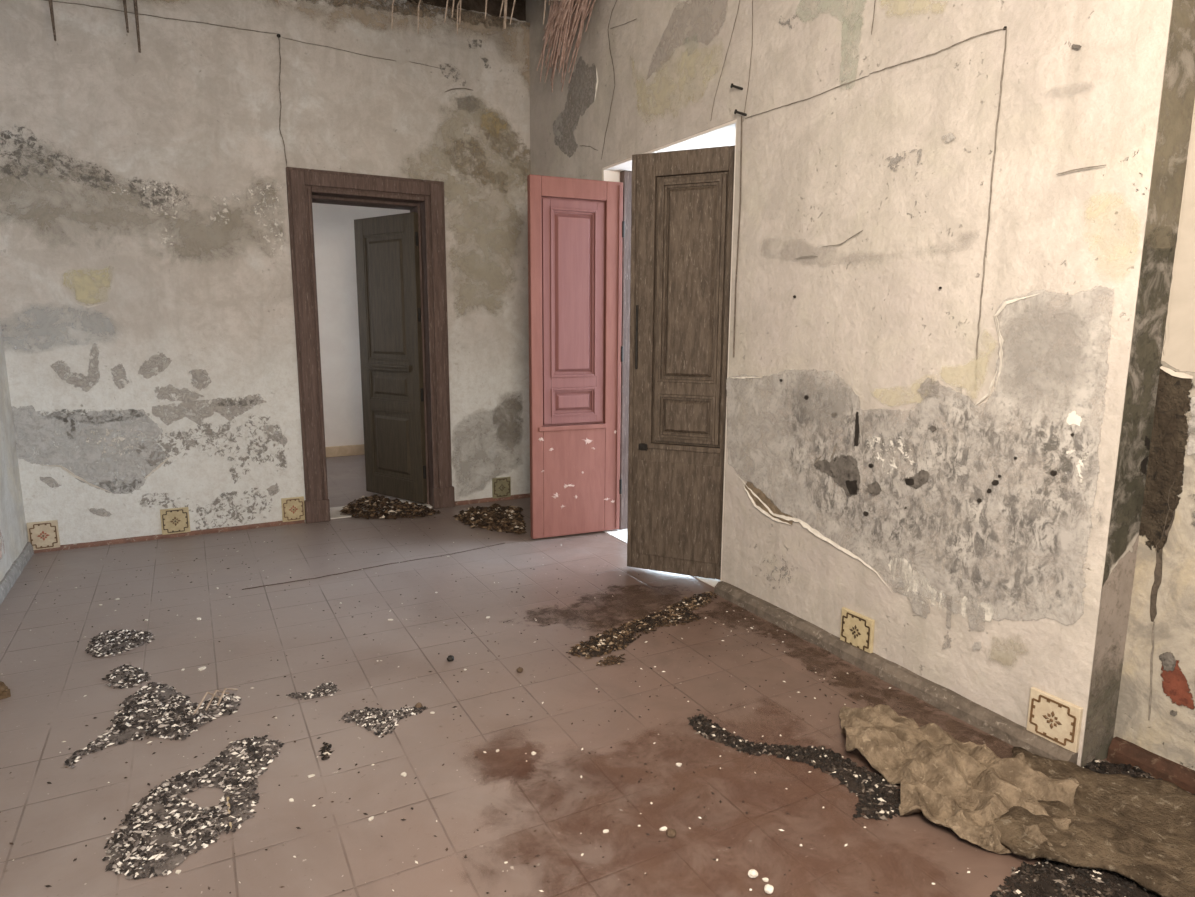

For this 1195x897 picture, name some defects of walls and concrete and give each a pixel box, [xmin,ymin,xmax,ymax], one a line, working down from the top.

spalling [307,0,530,28]
peeling [553,56,598,158]
damp [409,64,531,314]
crack [711,0,1007,391]
damp [726,0,1195,626]
peeling [12,343,287,530]
damp [454,396,522,489]
spalling [742,481,794,525]
spalling [814,412,881,497]
spalling [904,469,929,489]
peeling [942,595,1024,665]
corrosion [1159,652,1195,716]